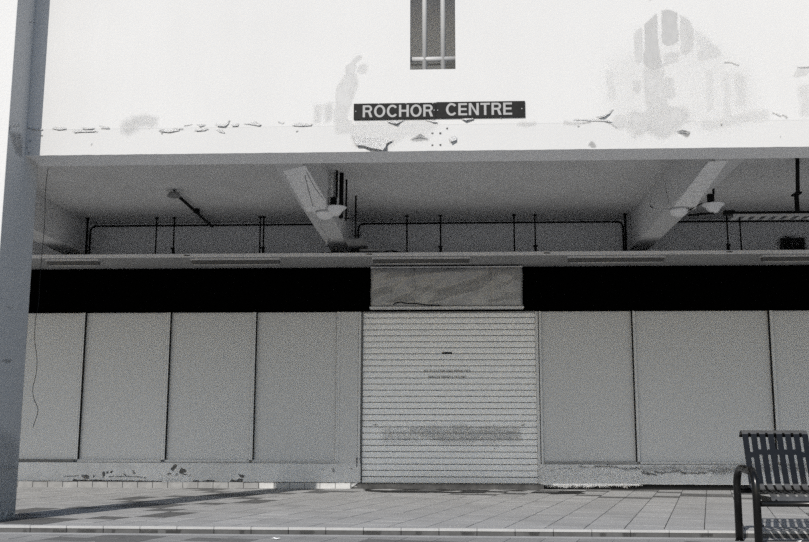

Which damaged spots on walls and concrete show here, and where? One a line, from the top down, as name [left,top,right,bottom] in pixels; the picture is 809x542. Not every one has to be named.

peeling [52,125,109,133]
peeling [120,114,262,137]
peeling [350,119,440,152]
peeling [65,464,215,482]